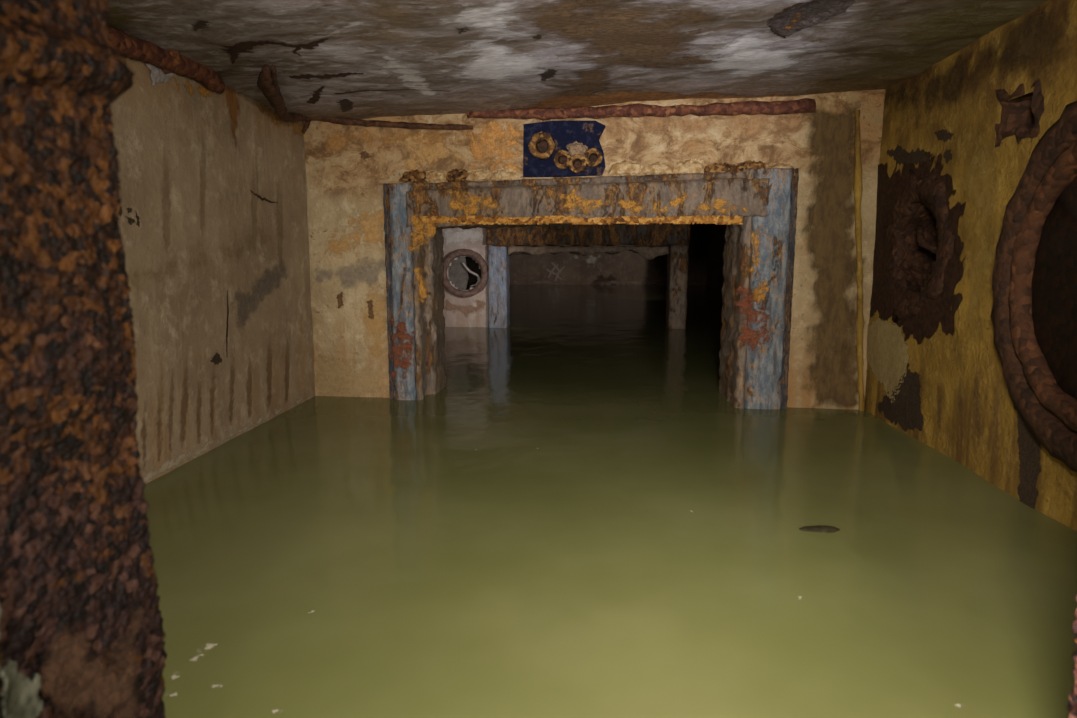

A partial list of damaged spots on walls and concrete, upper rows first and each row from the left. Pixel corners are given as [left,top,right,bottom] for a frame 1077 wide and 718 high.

spalling [767,0,855,38]
crack [219,38,450,104]
rust [525,91,797,108]
rust [408,188,748,251]
rust [414,267,428,302]
rust [736,233,769,351]
rust [363,296,415,379]
rust [1014,407,1041,509]
peeling [0,607,44,718]
rust [41,610,143,718]